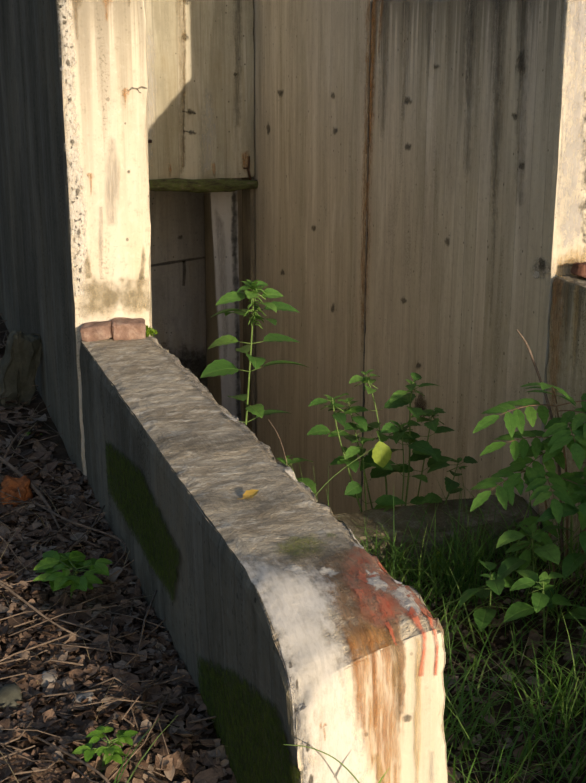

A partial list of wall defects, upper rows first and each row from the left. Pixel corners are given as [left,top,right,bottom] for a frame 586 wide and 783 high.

rust [361,0,383,293]
water stain [165,343,206,377]
peeling [355,562,422,616]
rust [347,623,402,783]